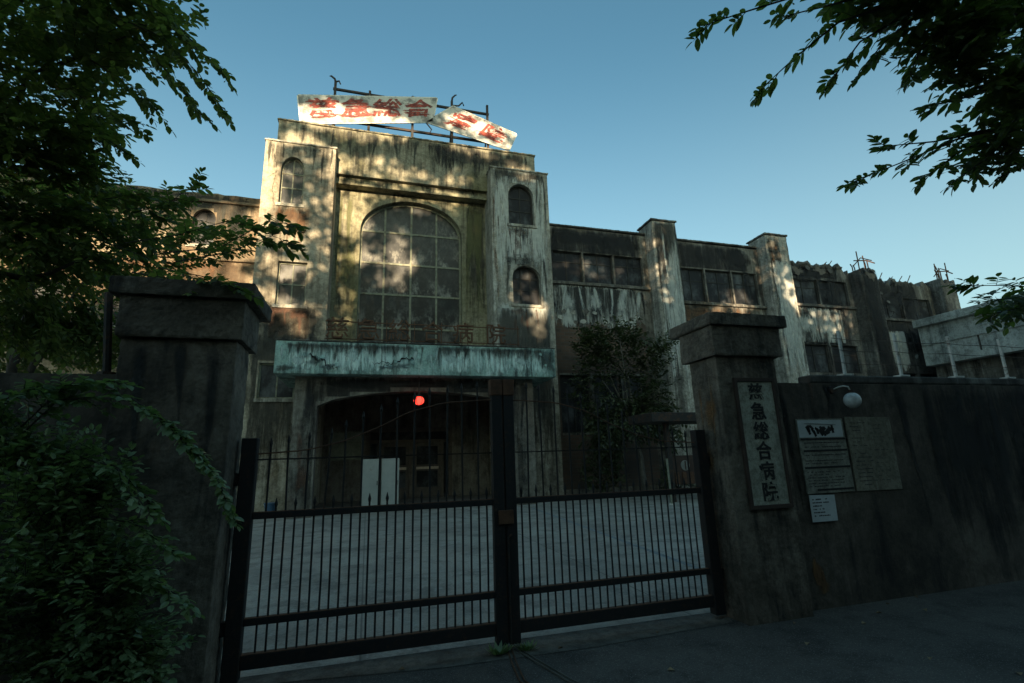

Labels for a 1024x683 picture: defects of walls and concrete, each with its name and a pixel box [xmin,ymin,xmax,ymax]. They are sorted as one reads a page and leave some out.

rust [269,307,309,334]
water stain [246,125,645,507]
water stain [767,238,847,373]
spalling [790,251,911,286]